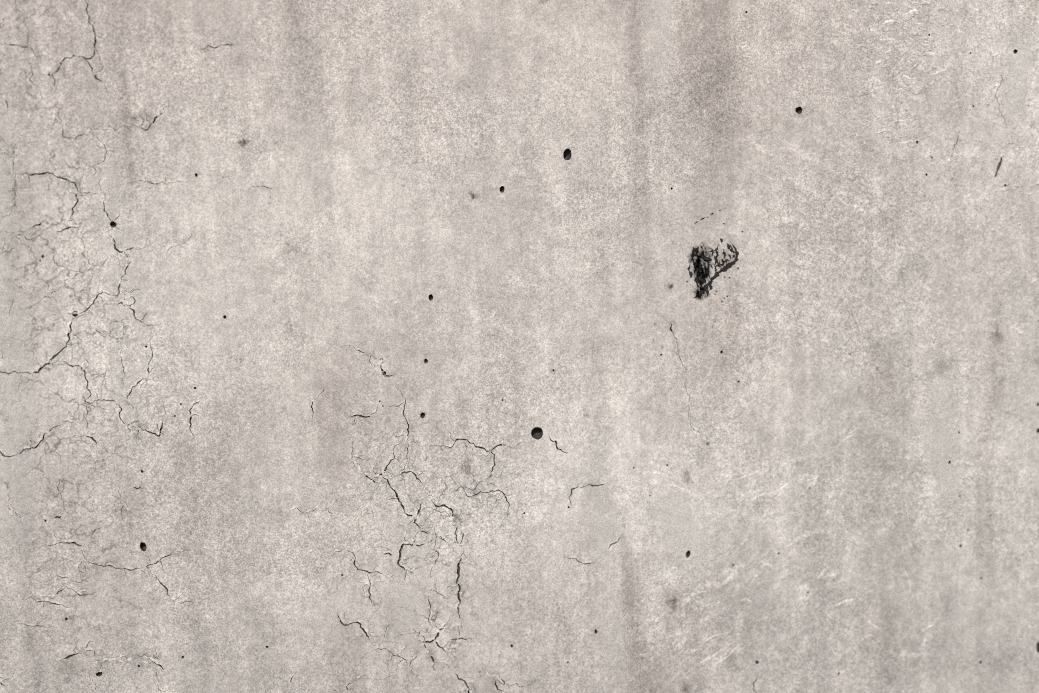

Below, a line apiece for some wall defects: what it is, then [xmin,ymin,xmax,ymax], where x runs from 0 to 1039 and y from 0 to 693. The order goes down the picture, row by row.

crack [0,0,200,517]
crack [309,390,324,417]
crack [549,437,567,453]
crack [289,497,341,517]
crack [333,345,536,693]
crack [568,474,605,505]
crack [12,479,193,629]
crack [56,641,172,693]